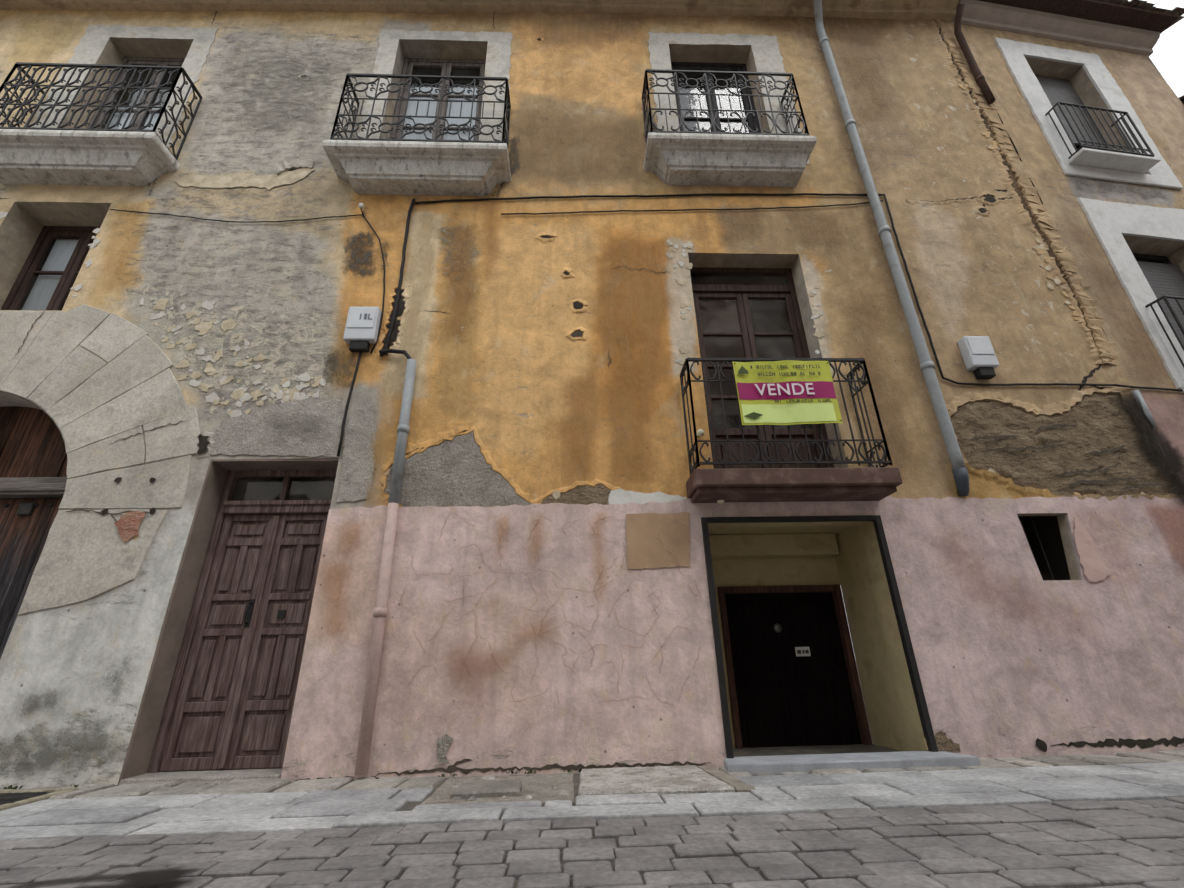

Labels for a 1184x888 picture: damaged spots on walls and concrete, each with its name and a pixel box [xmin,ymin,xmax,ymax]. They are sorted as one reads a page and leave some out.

crack [906,18,1119,415]
damp [345,232,388,277]
peeling [139,298,328,418]
damp [323,350,353,386]
spalling [379,425,620,507]
spalling [948,386,1184,501]
flaking render [114,509,150,545]
crack [1051,736,1184,749]
crack [295,759,711,781]